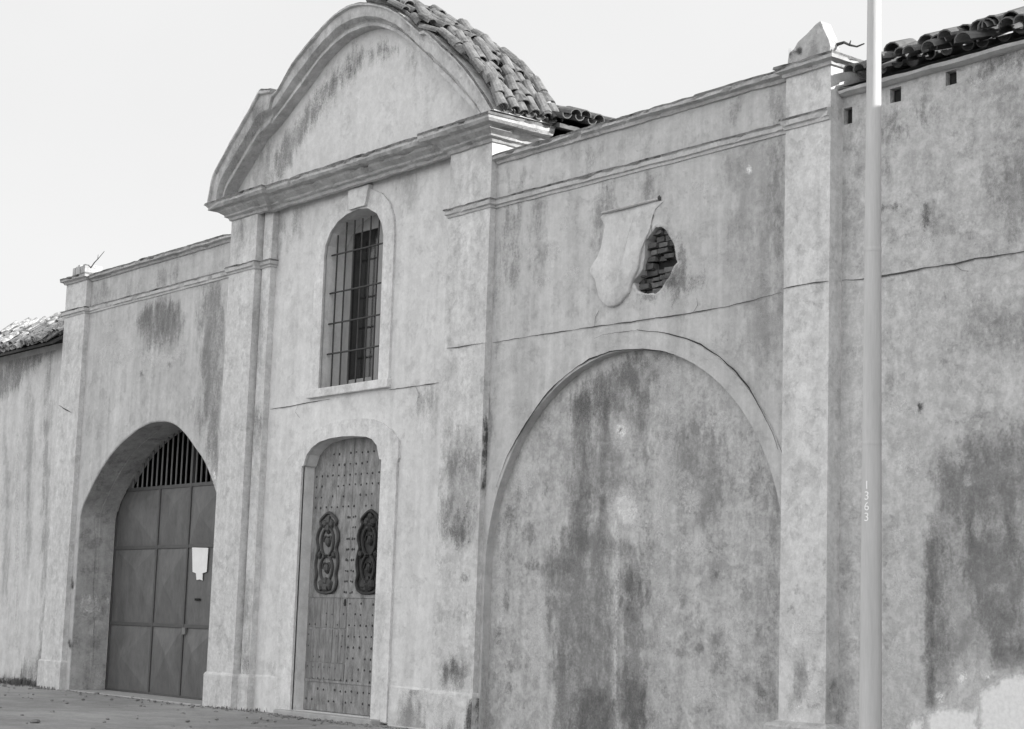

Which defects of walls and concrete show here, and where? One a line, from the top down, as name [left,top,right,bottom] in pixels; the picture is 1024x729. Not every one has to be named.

flaking render [632,221,679,297]
damp [612,520,620,729]